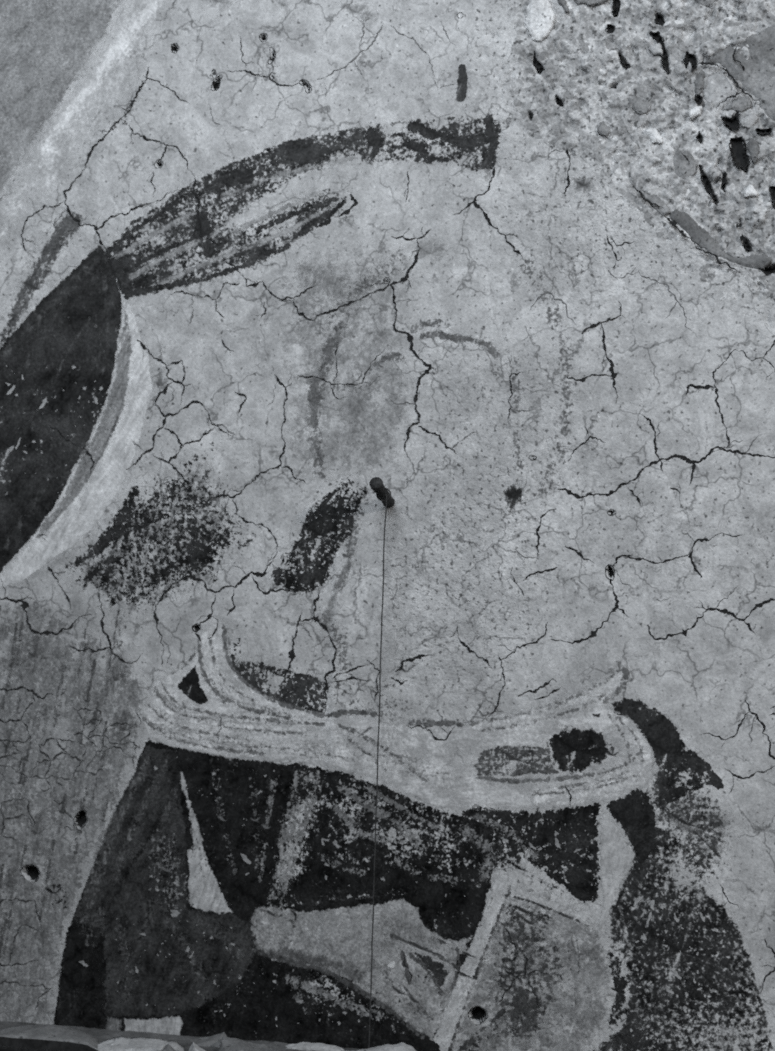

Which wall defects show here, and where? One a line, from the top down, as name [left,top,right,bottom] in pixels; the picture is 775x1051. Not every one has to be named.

crack [226,18,453,98]
crack [457,163,526,269]
crack [547,149,570,194]
spalling [505,0,775,302]
crack [531,233,696,402]
crack [0,66,473,711]
crack [450,340,775,717]
crack [0,686,141,844]
crack [409,709,452,741]
crack [704,700,775,792]
crack [0,898,51,1011]
crack [761,940,775,991]